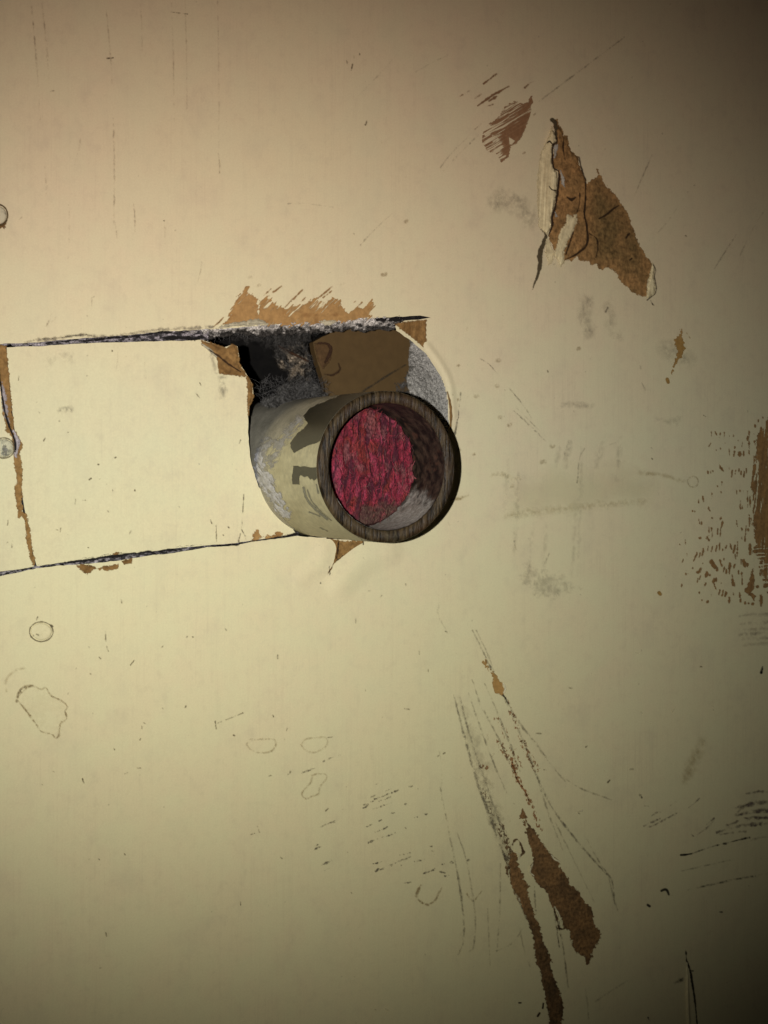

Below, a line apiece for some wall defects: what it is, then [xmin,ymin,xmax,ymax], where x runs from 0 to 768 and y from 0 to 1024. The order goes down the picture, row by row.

peeling [183,286,404,404]
peeling [290,391,374,453]
flaking render [407,340,449,433]
crack [0,530,298,576]
peeling [292,466,317,484]
peeling [681,417,768,606]
spalling [482,660,601,1024]